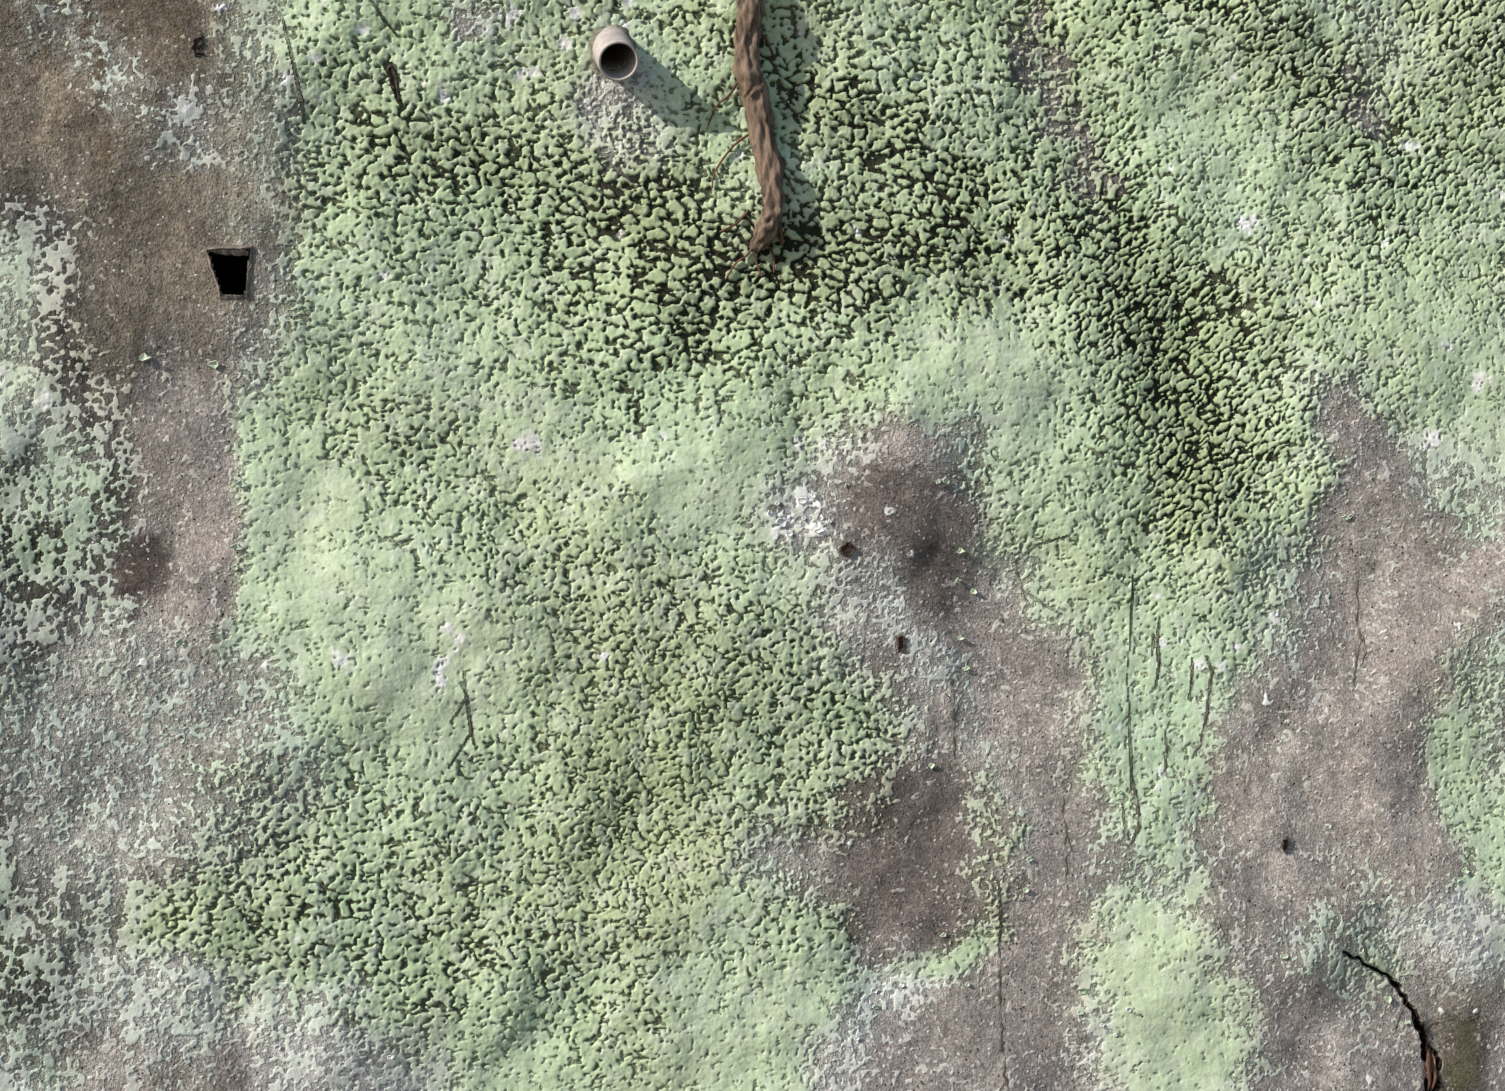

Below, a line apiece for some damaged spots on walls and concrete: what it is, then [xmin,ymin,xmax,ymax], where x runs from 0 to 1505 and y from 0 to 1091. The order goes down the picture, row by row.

water stain [767,492,832,537]
crack [1344,942,1483,1091]